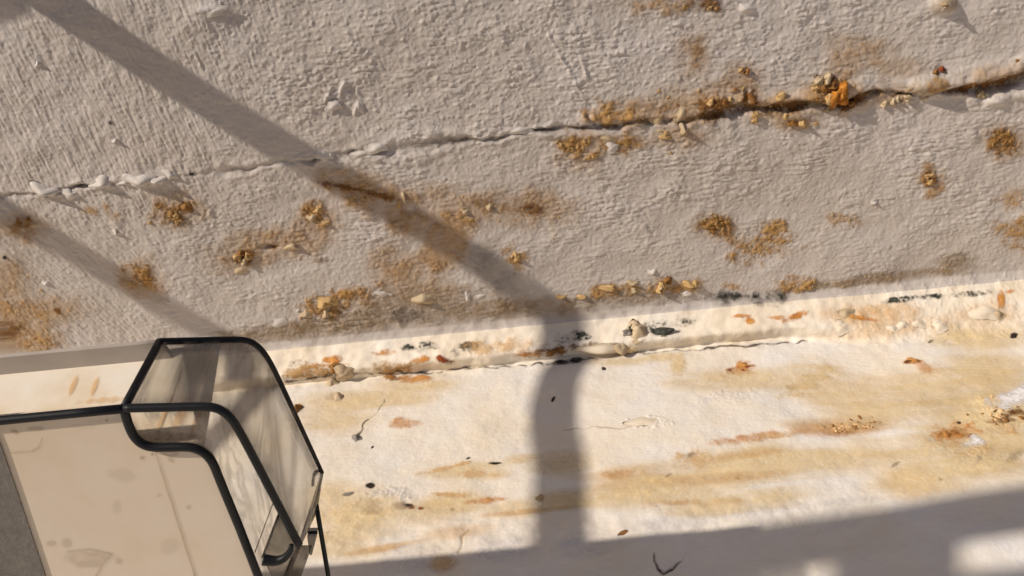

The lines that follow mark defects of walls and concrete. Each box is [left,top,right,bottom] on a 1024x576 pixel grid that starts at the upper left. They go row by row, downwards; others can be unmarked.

crack [942,71,1024,99]
crack [580,72,913,154]
crack [30,169,179,201]
spalling [233,242,254,274]
peeling [555,269,700,300]
crack [703,340,805,350]
leakage [886,291,1021,396]
crack [390,357,592,374]
leakage [435,461,492,475]
leakage [593,447,880,514]
leakage [431,493,502,508]
leakage [324,490,402,553]